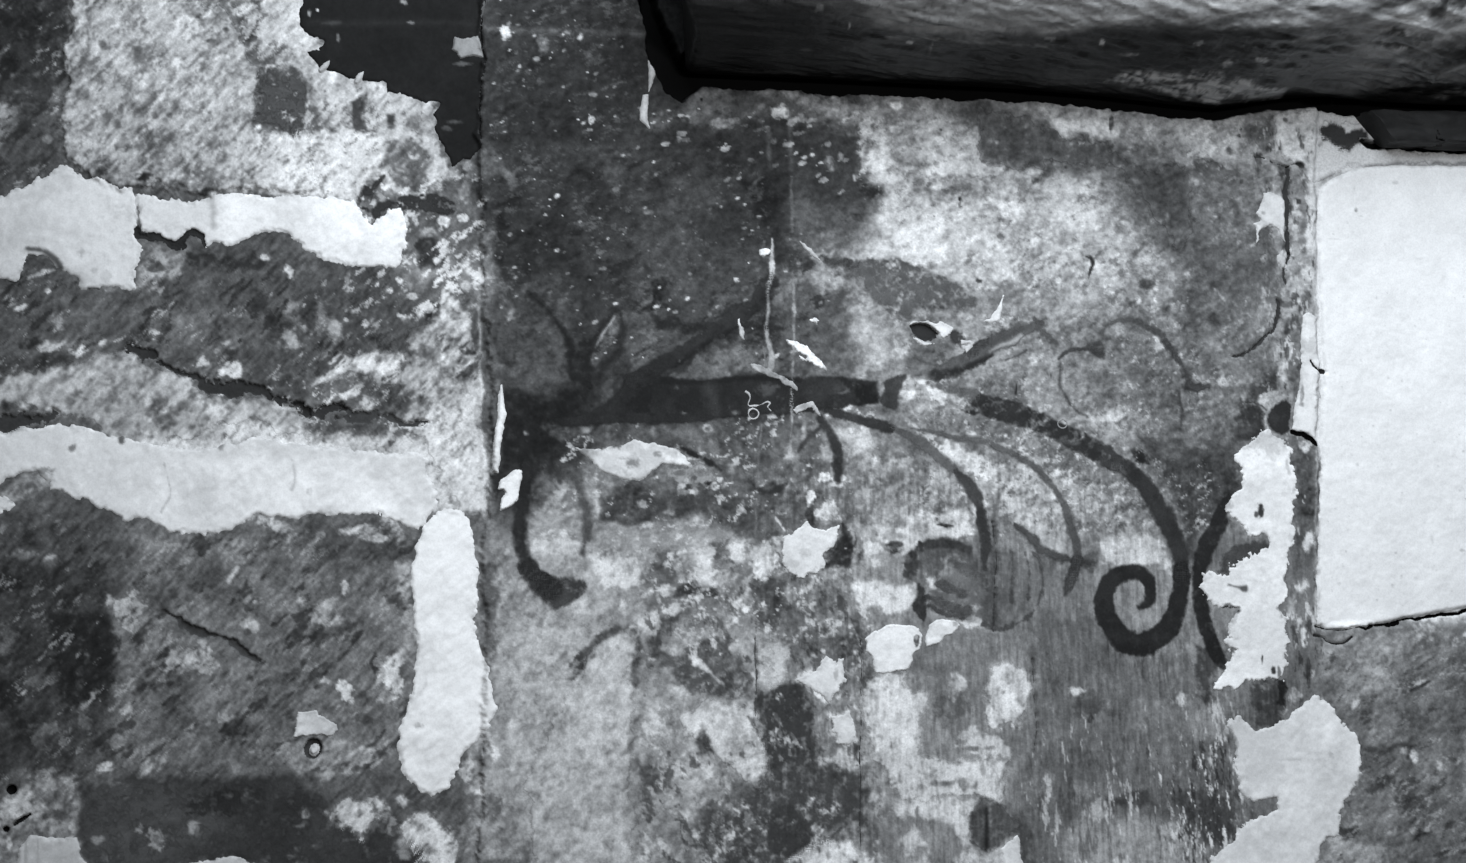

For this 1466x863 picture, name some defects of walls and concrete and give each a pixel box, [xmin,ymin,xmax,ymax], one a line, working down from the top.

peeling [299,0,488,167]
peeling [0,165,455,292]
crack [123,342,429,427]
peeling [0,288,522,863]
peeling [781,521,840,578]
peeling [1199,312,1320,690]
peeling [756,619,1011,805]
peeling [1210,694,1362,863]